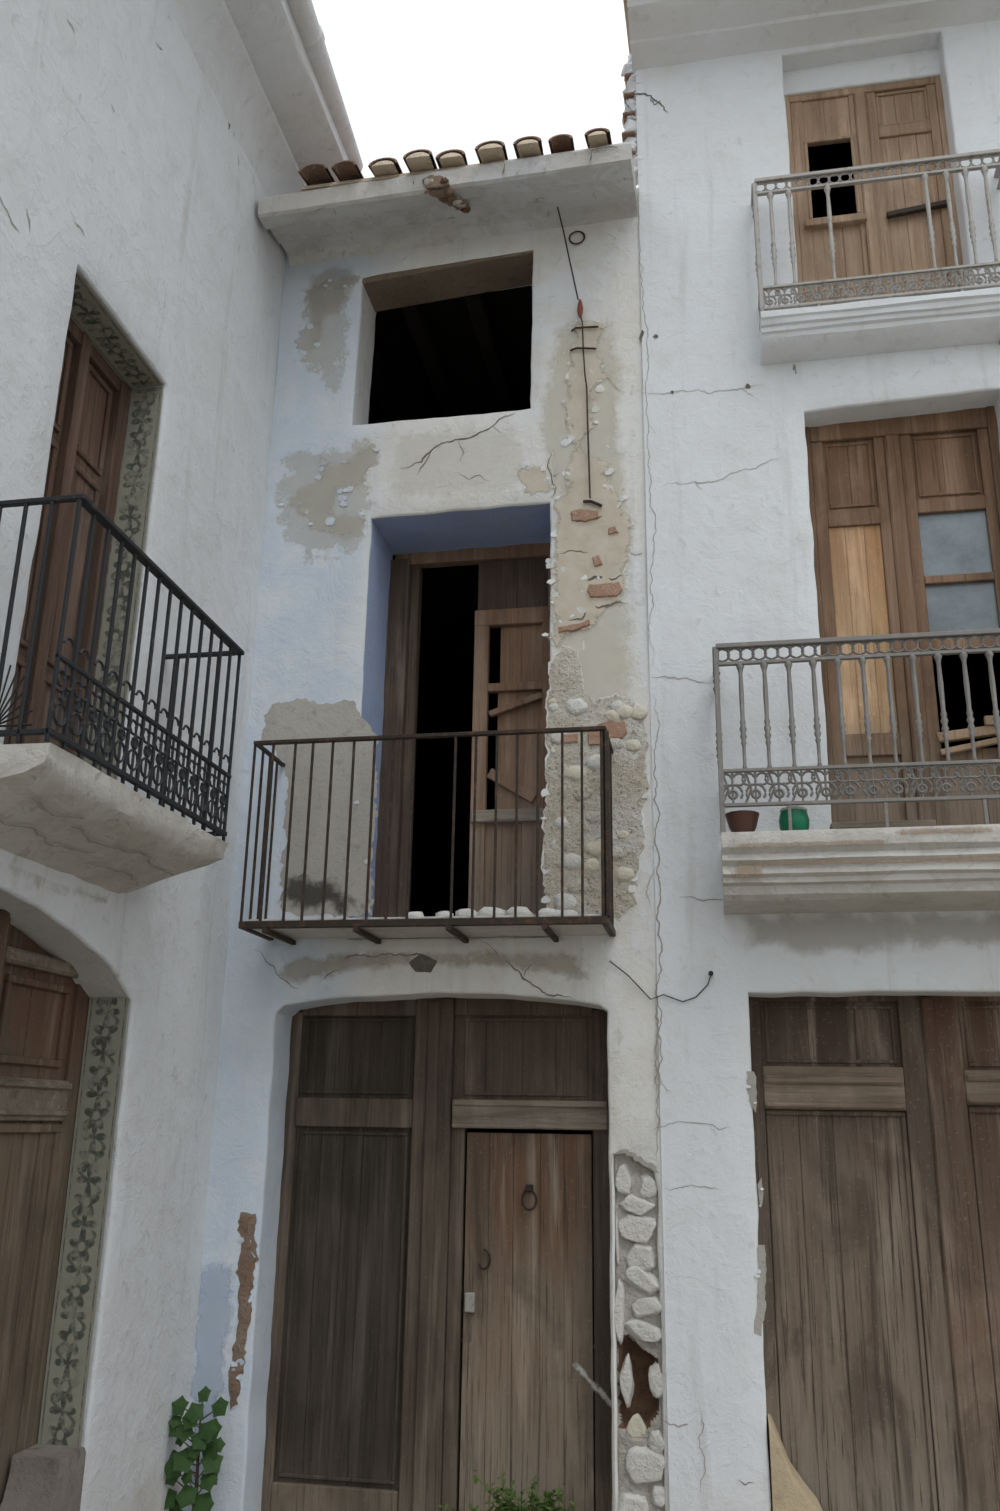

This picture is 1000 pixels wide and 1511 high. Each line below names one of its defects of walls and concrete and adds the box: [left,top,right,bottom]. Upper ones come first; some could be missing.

peeling [278,446,380,540]
crack [399,414,513,481]
peeling [515,320,642,647]
crack [601,180,773,1191]
spalling [611,1154,668,1511]